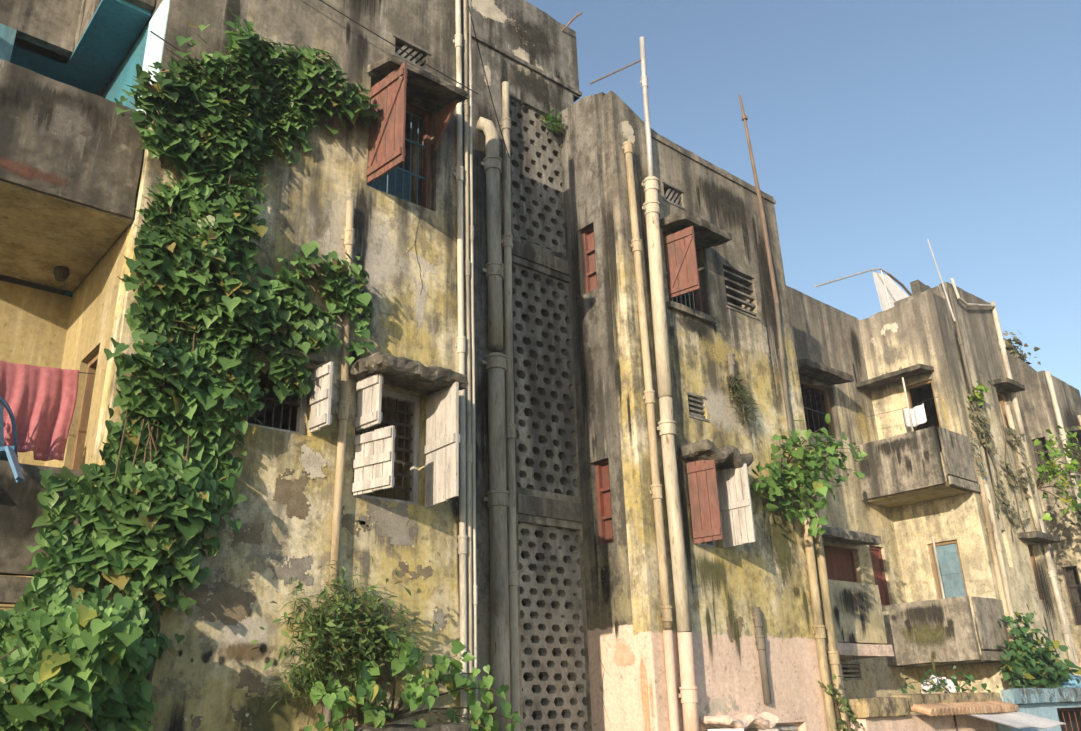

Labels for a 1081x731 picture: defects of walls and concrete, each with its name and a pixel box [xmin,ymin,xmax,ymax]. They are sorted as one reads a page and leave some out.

peeling [471,0,544,78]
damp [638,169,651,300]
damp [697,179,789,396]
efflorescence [704,391,755,452]
peeling [272,444,327,520]
peeling [179,578,257,625]
peeling [219,512,313,595]
spalling [341,498,418,548]
peeling [392,560,434,581]
damp [675,444,740,657]
damp [834,589,869,644]
damp [901,604,954,637]